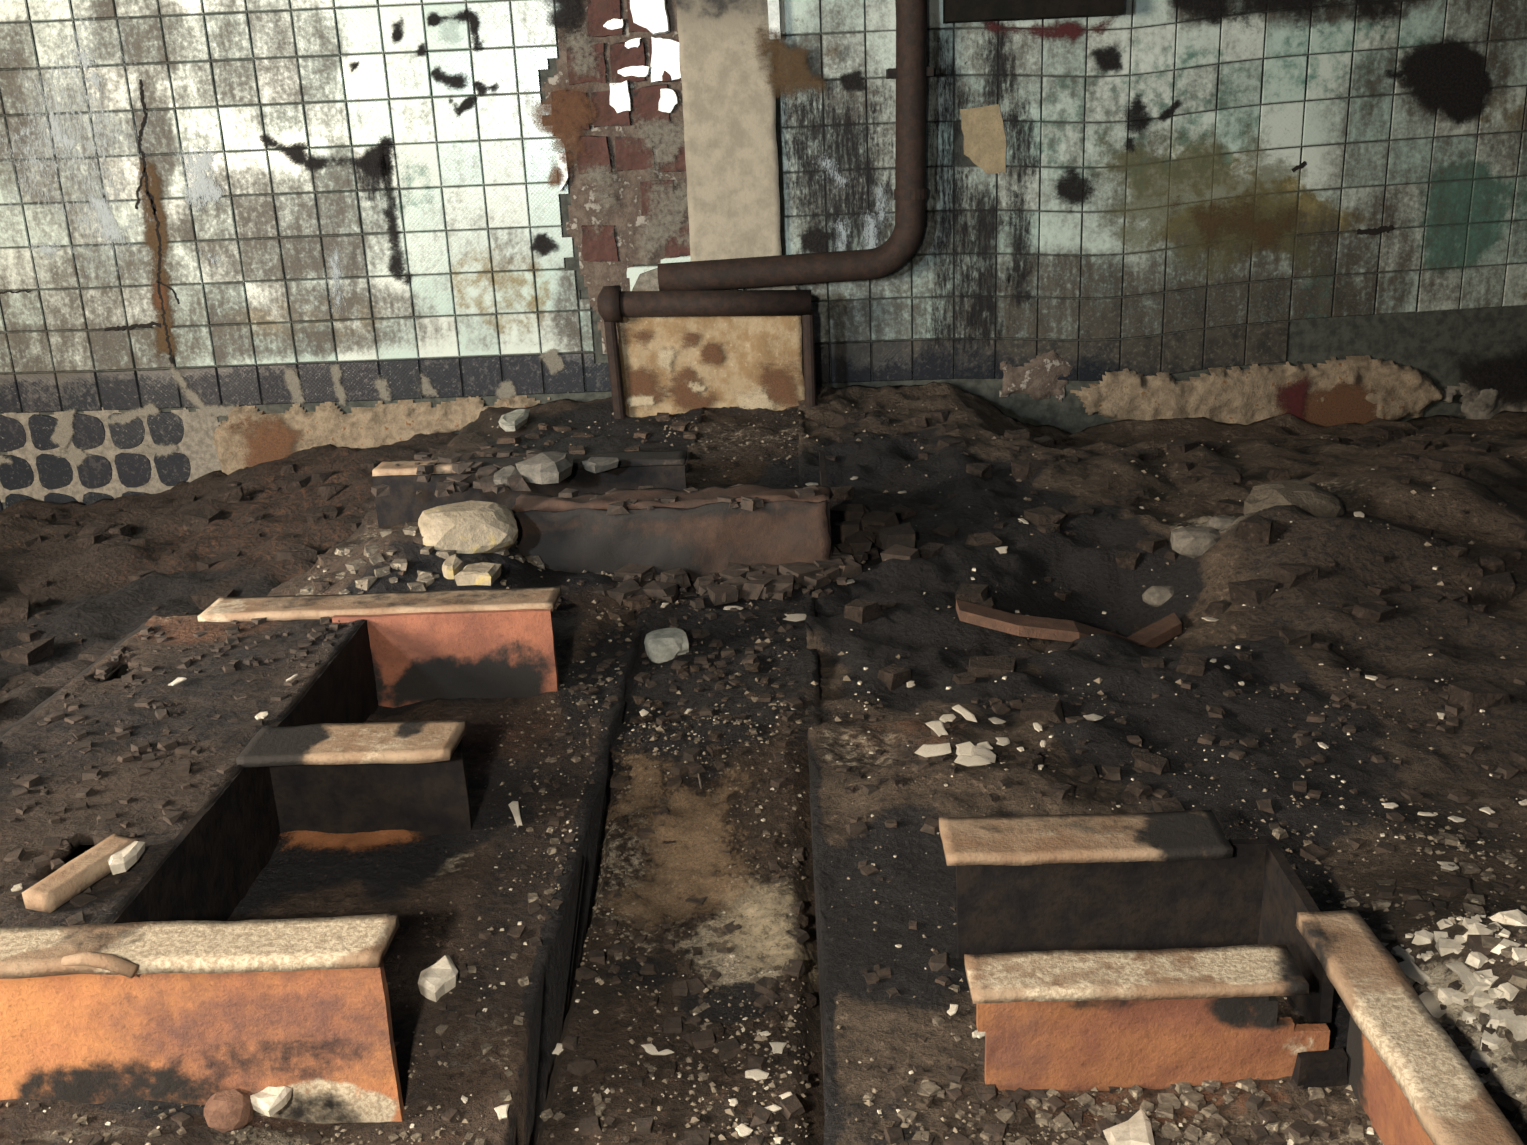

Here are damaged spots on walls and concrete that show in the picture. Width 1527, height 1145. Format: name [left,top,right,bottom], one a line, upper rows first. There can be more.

corrosion [756,28,825,97]
leakage [839,71,865,91]
crack [104,79,179,364]
leakage [353,137,410,280]
flaking render [551,0,690,291]
leakage [812,153,846,193]
leakage [800,184,891,253]
leakage [961,21,1042,350]
flaking render [0,364,550,502]
flaking render [627,395,655,407]
flaking render [737,388,776,410]
flaking render [999,341,1527,427]